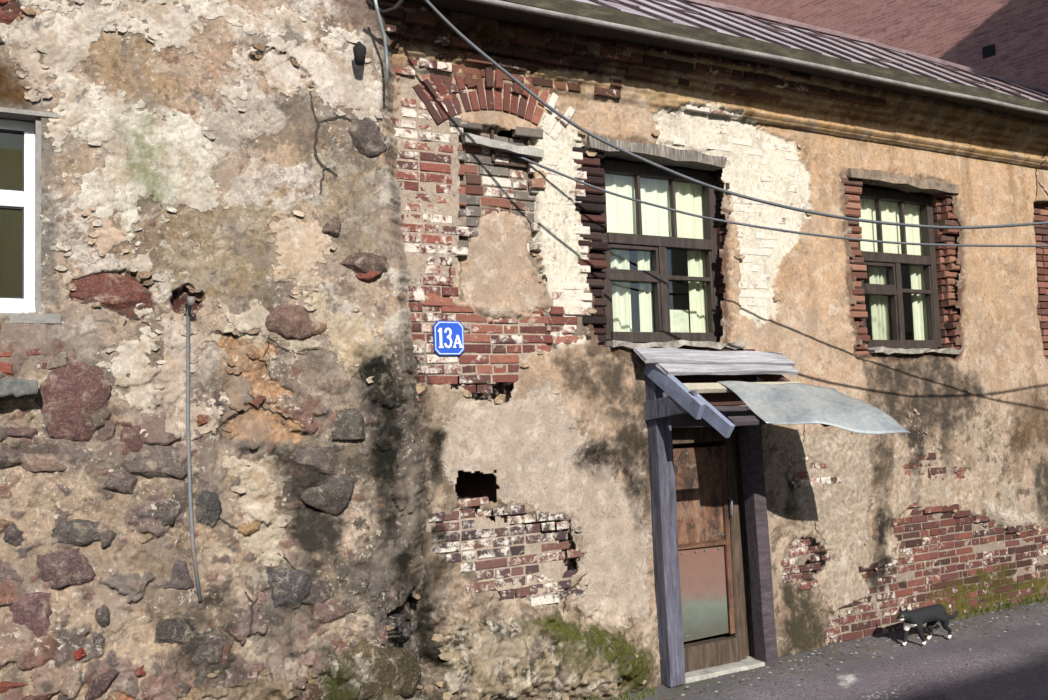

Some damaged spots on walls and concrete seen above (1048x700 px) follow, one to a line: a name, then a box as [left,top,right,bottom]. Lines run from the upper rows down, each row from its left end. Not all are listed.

crack [253,46,354,194]
spalling [652,102,813,326]
flaking render [0,0,655,634]
water stain [275,454,342,555]
water stain [357,353,403,539]
spalling [385,594,421,666]
water stain [393,525,448,666]
water stain [413,353,446,474]
water stain [554,346,651,495]
water stain [618,660,648,689]
spalling [781,407,1048,646]
water stain [863,354,982,471]